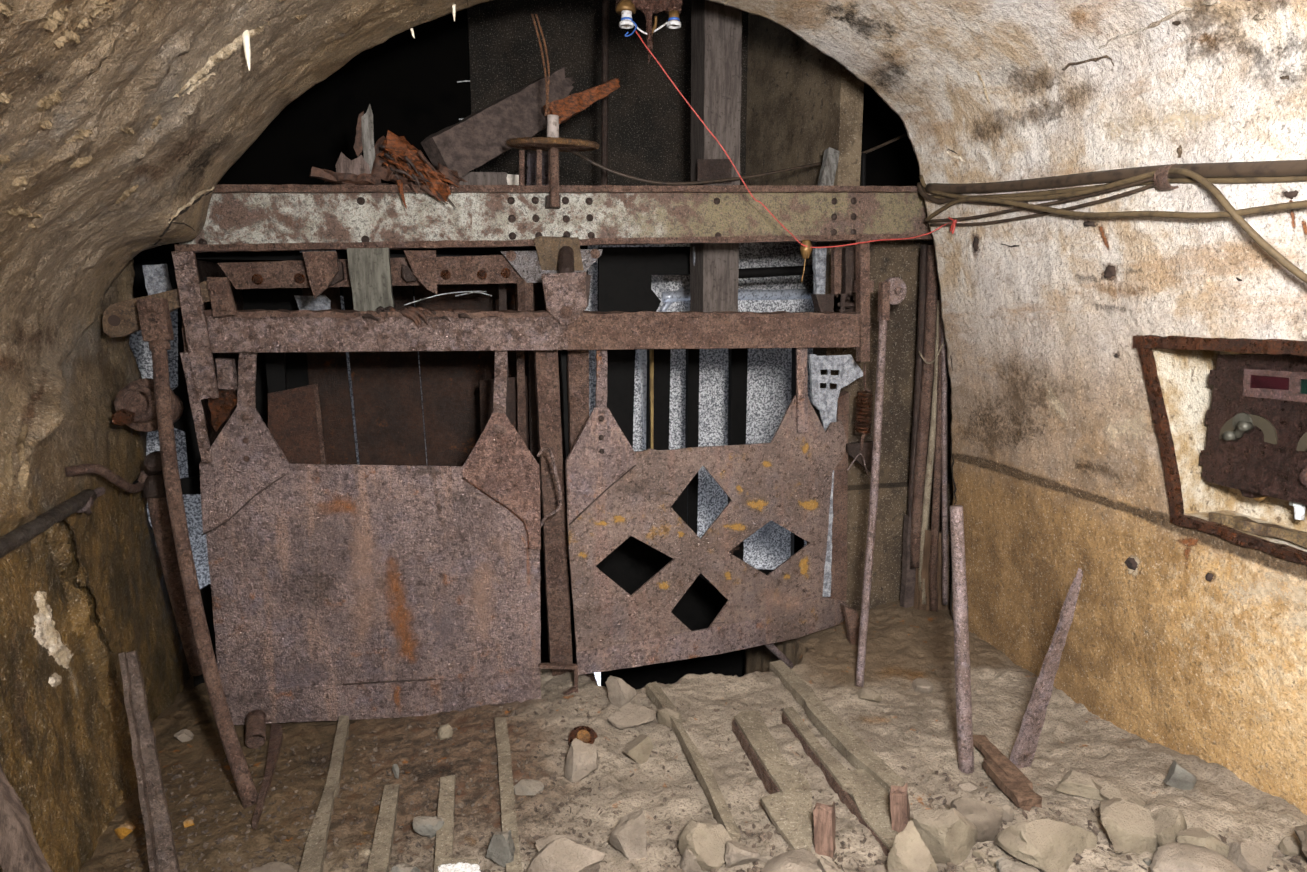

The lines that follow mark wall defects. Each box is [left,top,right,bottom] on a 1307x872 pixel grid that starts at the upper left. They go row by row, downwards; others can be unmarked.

leakage [1179,3,1266,85]